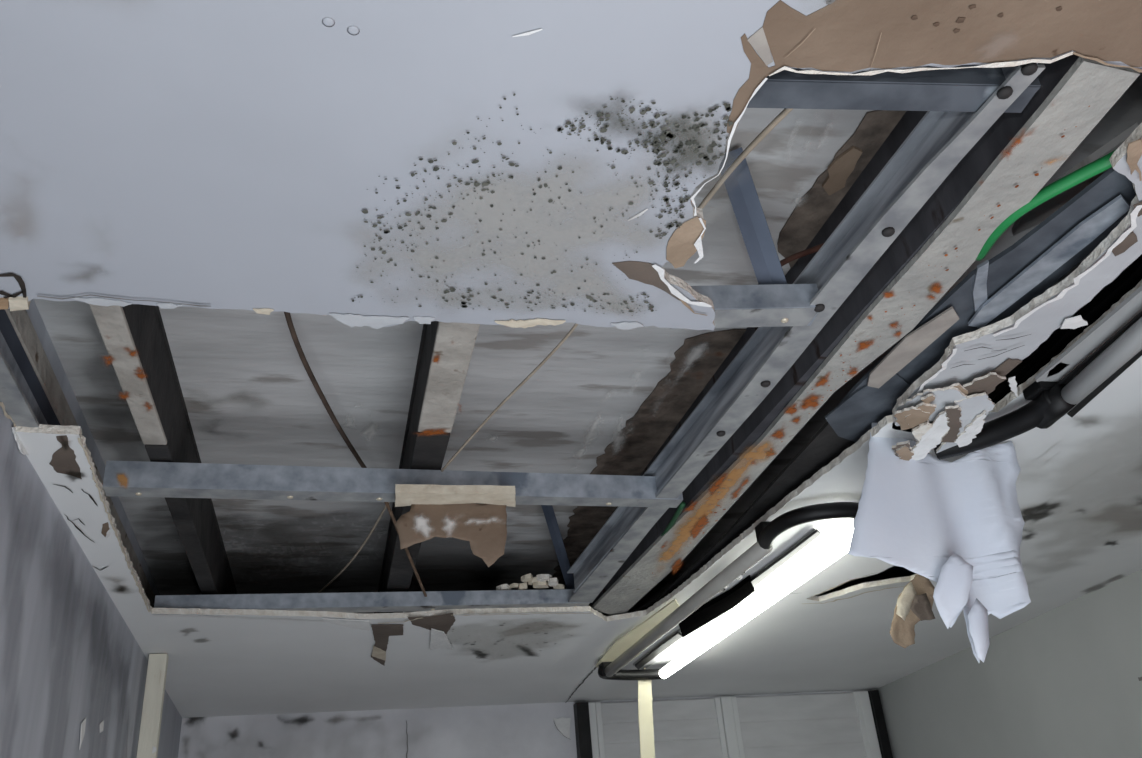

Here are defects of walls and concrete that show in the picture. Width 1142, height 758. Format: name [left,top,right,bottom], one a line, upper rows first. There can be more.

peeling [612,0,1142,316]
mould [352,93,733,316]
peeling [37,294,211,309]
peeling [329,313,435,329]
peeling [495,318,566,328]
peeling [1061,315,1088,329]
spalling [590,329,746,476]
peeling [892,358,1022,461]
flaking render [49,435,84,481]
corrosion [660,340,873,573]
spalling [552,506,617,584]
water stain [1022,504,1058,521]